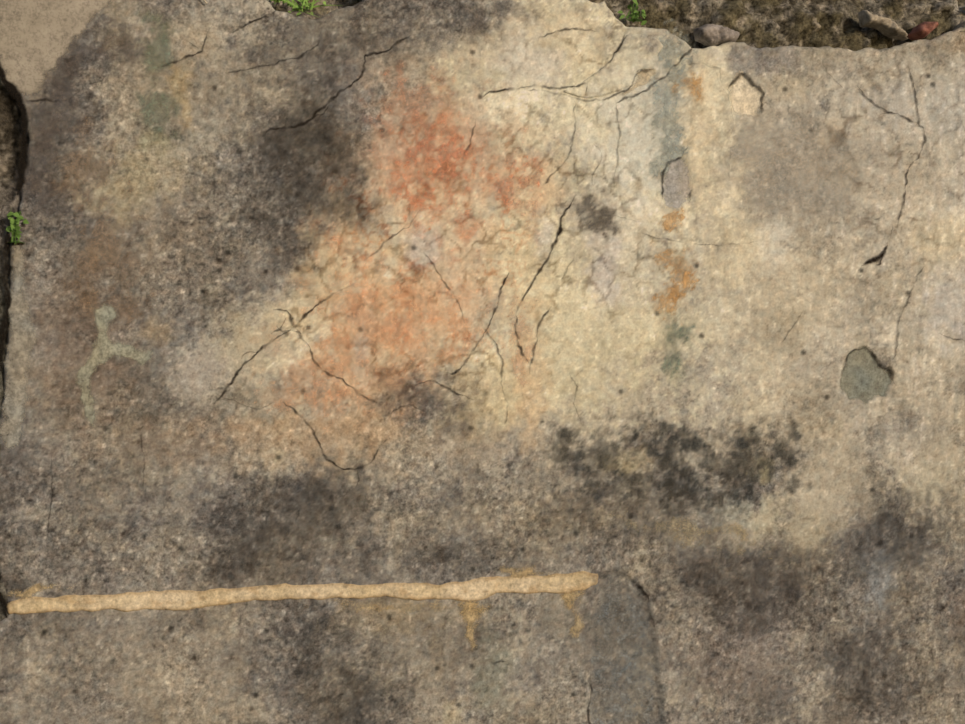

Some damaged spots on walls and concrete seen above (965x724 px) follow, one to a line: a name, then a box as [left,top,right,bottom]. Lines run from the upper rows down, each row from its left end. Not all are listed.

crack [270,38,405,130]
crack [485,84,587,95]
crack [611,49,692,134]
spalling [730,72,765,116]
spalling [664,160,690,208]
crack [860,73,926,265]
crack [476,199,574,372]
crack [220,300,324,400]
spalling [840,346,894,403]
crack [285,404,360,481]
water stain [553,429,644,497]
water stain [655,425,797,508]